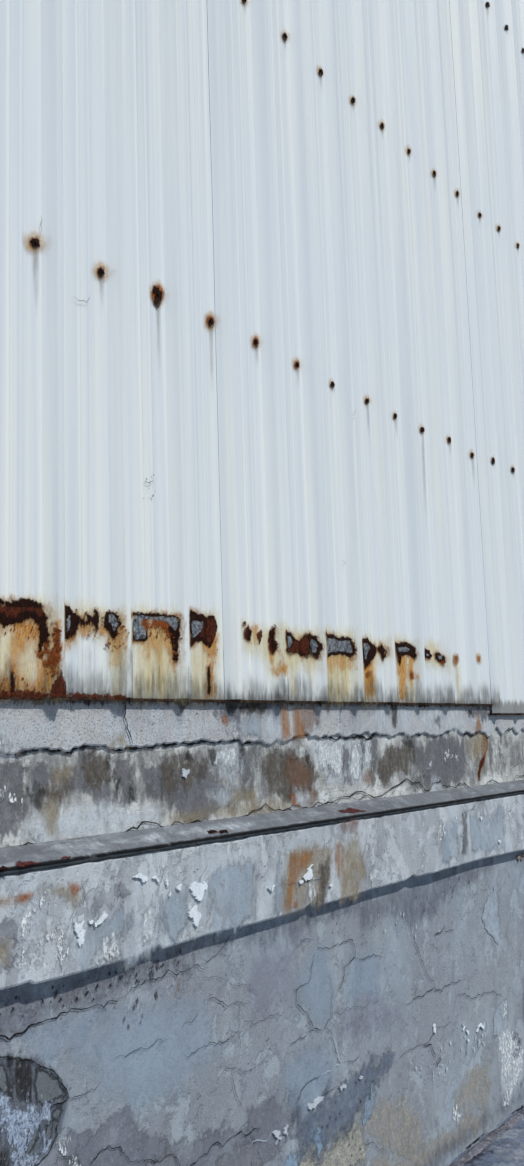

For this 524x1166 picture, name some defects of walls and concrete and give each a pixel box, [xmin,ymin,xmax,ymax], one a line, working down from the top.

corrosion [27,215,42,250]
corrosion [152,285,164,308]
corrosion [0,596,218,701]
corrosion [242,621,458,699]
leakage [0,699,522,848]
corrosion [284,843,364,909]
peeling [0,873,208,1017]
leakage [91,904,158,966]
crack [0,702,524,1166]